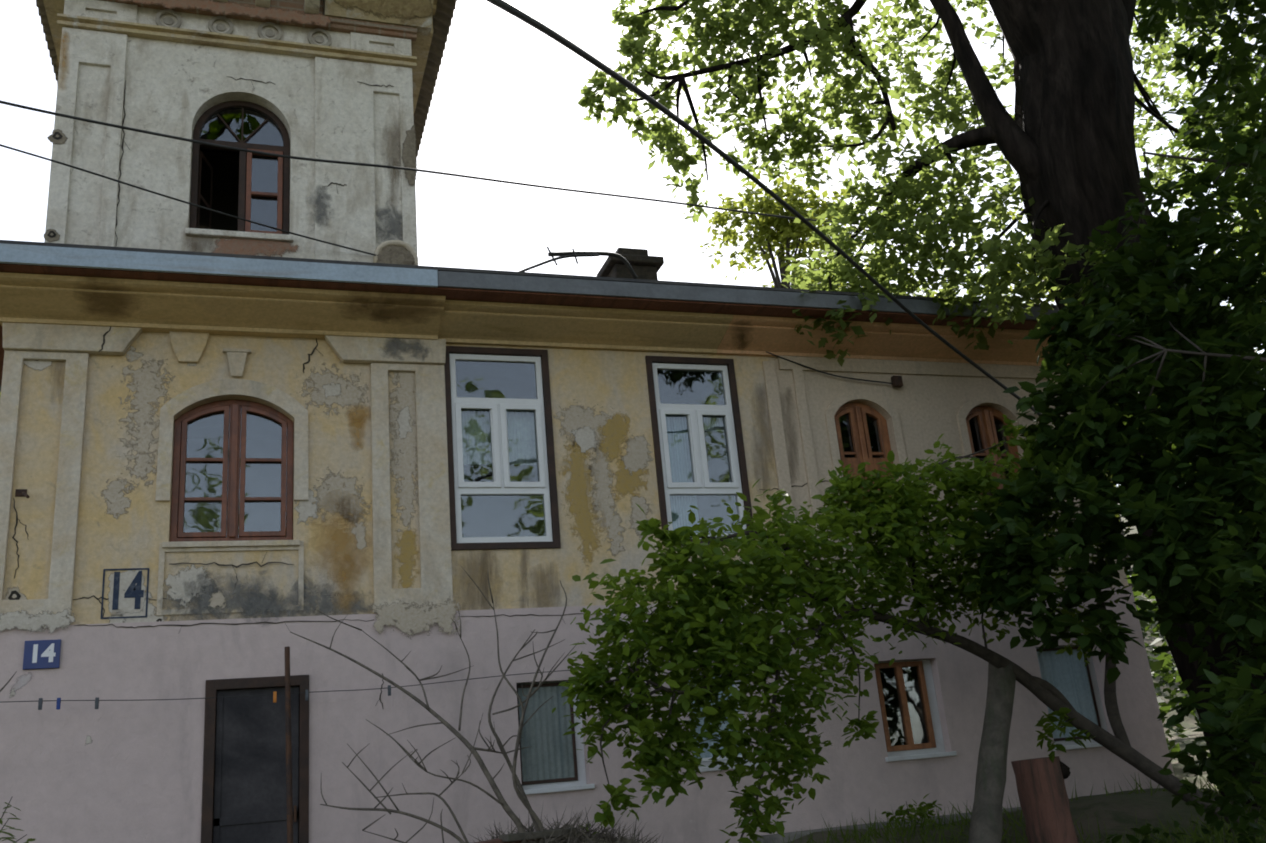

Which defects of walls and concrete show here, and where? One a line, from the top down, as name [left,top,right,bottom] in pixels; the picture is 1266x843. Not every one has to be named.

crack [115,80,130,245]
crack [12,498,28,578]
peeling [101,359,175,519]
peeling [293,466,372,549]
peeling [302,364,368,415]
peeling [370,372,461,637]
peeling [554,404,654,556]
flaking render [0,609,75,633]